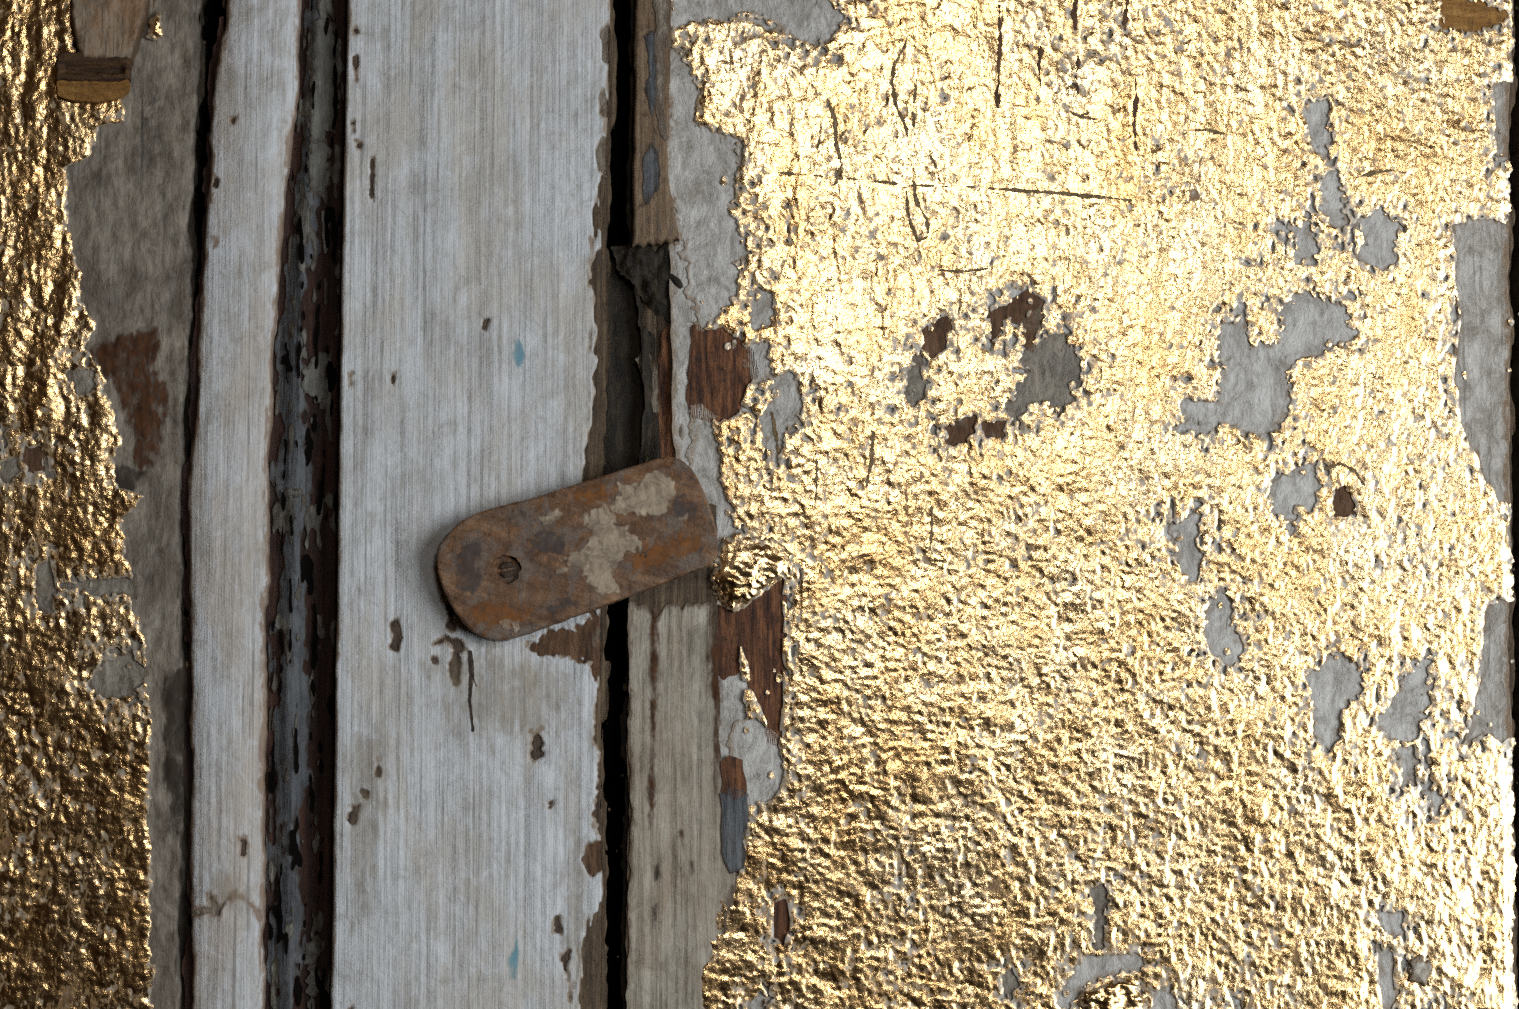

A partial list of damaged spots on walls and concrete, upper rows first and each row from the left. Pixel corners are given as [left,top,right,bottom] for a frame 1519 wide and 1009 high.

peeling [671,0,847,52]
peeling [1287,99,1400,271]
peeling [65,365,96,396]
peeling [667,48,804,543]
peeling [904,316,952,407]
peeling [939,289,1084,446]
peeling [1172,291,1359,437]
peeling [1452,217,1519,505]
peeling [1305,652,1363,751]
peeling [1464,598,1514,747]